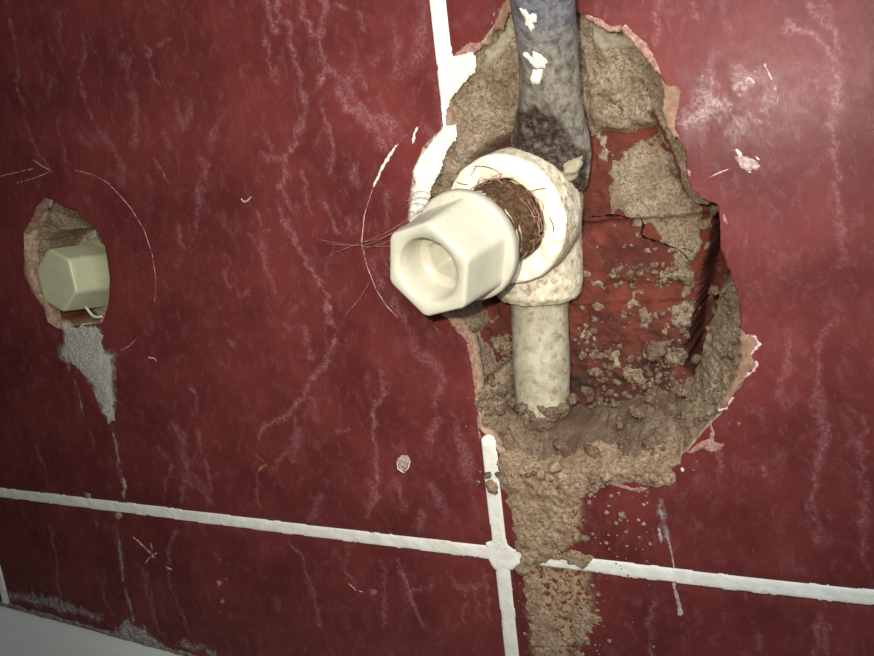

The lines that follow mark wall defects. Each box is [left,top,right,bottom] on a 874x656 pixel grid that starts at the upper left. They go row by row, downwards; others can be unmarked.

spalling [425,0,519,205]
spalling [24,198,105,317]
spalling [72,306,107,326]
spalling [450,11,762,489]
crack [591,214,700,262]
spalling [585,477,647,492]